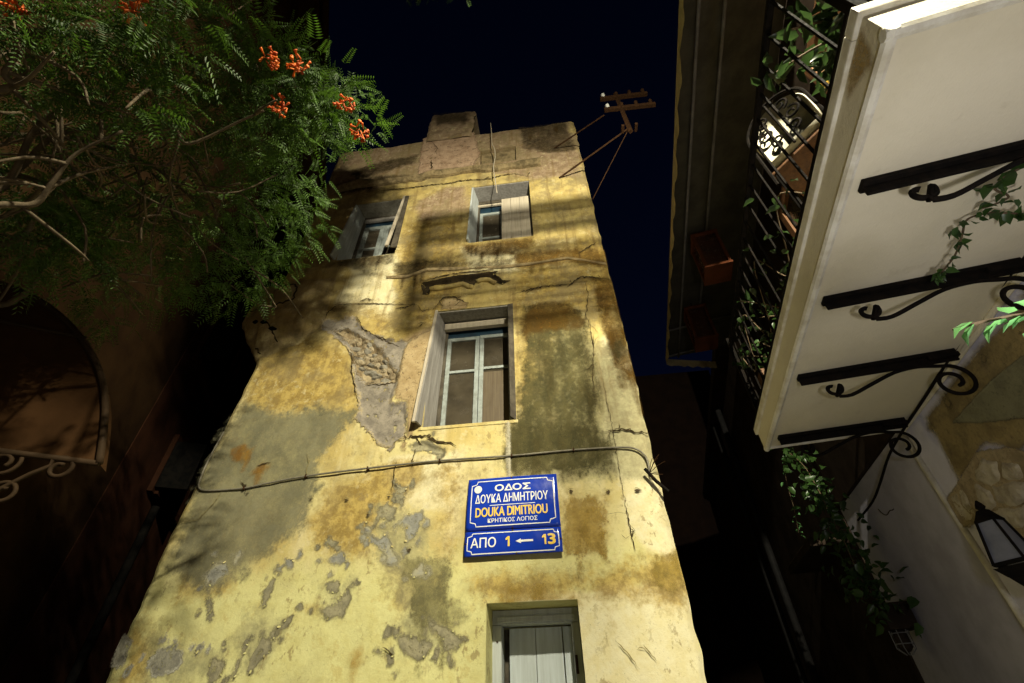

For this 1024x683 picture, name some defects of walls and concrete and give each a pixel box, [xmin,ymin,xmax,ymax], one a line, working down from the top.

flaking render [421,269,510,310]
peeling [167,315,446,621]
crack [391,434,456,490]
damp [503,303,616,477]
crack [517,242,649,549]
peeling [111,536,361,683]
peeling [374,616,469,678]